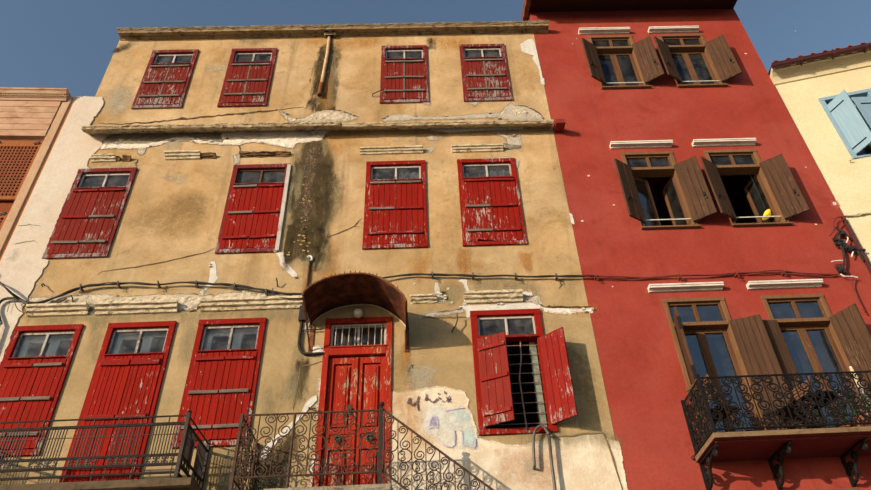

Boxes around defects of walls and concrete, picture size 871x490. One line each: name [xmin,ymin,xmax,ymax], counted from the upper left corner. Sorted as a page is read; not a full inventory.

water stain [307,44,338,111]
peeling [520,39,545,85]
flaking render [100,110,359,149]
flaking render [382,102,544,168]
water stain [284,140,335,269]
flaking render [28,290,289,314]
flaking render [523,291,594,315]
flaking render [390,386,628,490]